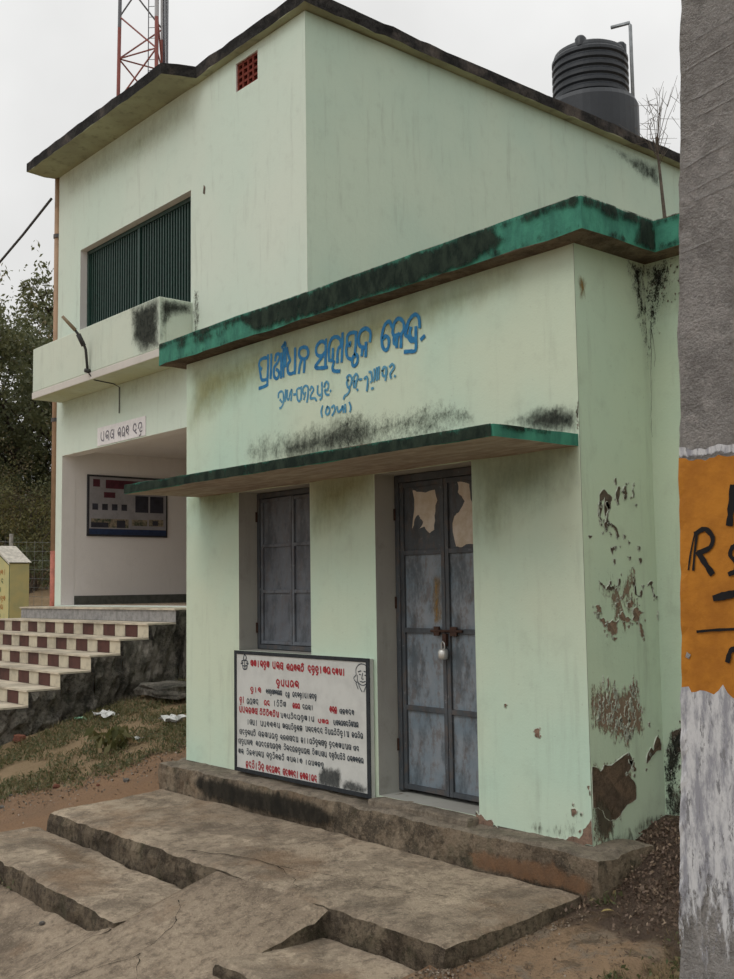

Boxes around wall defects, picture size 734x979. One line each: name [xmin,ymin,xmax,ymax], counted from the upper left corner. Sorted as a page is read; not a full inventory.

water stain [622,154,658,181]
water stain [132,223,506,351]
water stain [521,195,677,355]
water stain [124,408,573,493]
peeling [588,478,659,642]
peeling [475,811,498,828]
spalling [555,675,681,845]
water stain [664,730,681,814]